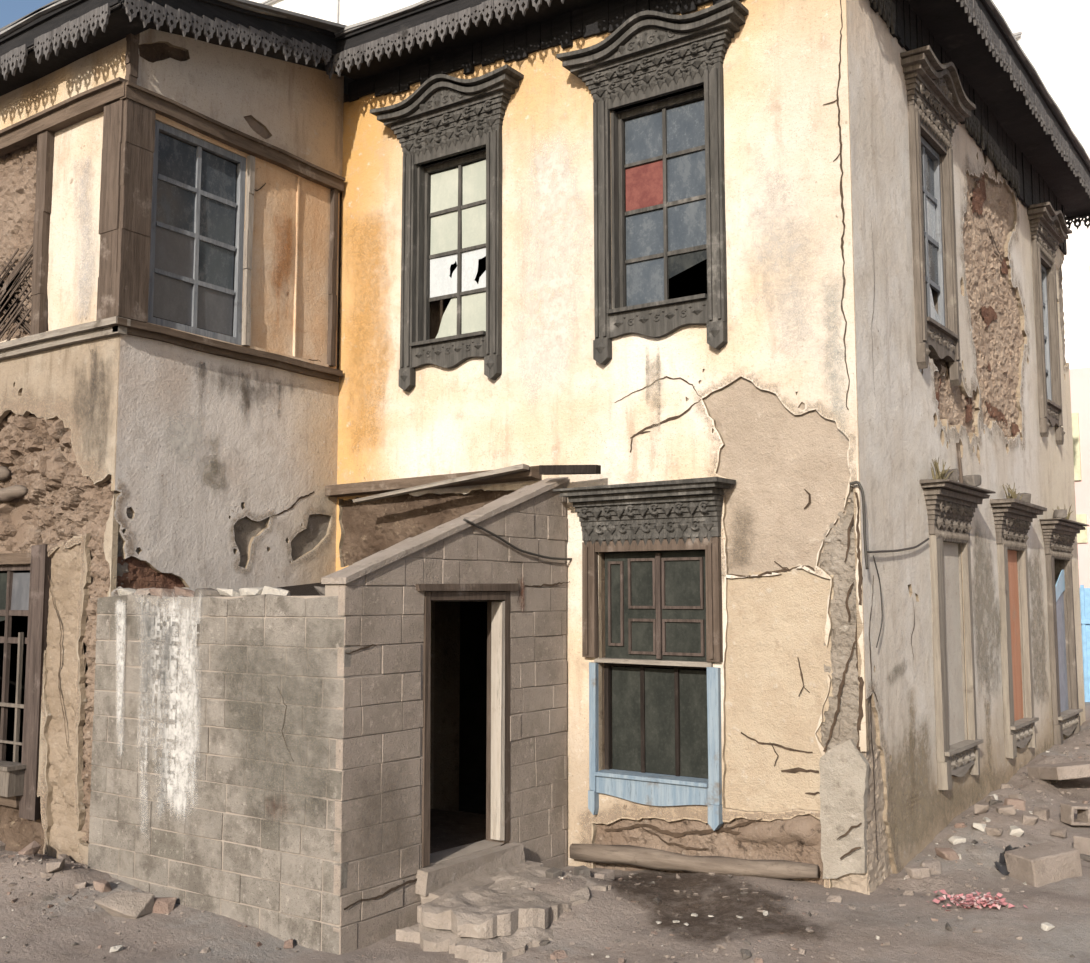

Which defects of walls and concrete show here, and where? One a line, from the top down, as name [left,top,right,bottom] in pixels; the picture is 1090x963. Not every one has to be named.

peeling [0,478,139,864]
peeling [231,503,273,571]
crack [271,491,314,517]
peeling [286,508,332,561]
crack [615,376,701,453]
peeling [582,369,901,895]
crack [721,561,814,578]
crack [741,485,879,860]
crack [823,0,875,410]
peeling [933,154,1029,458]